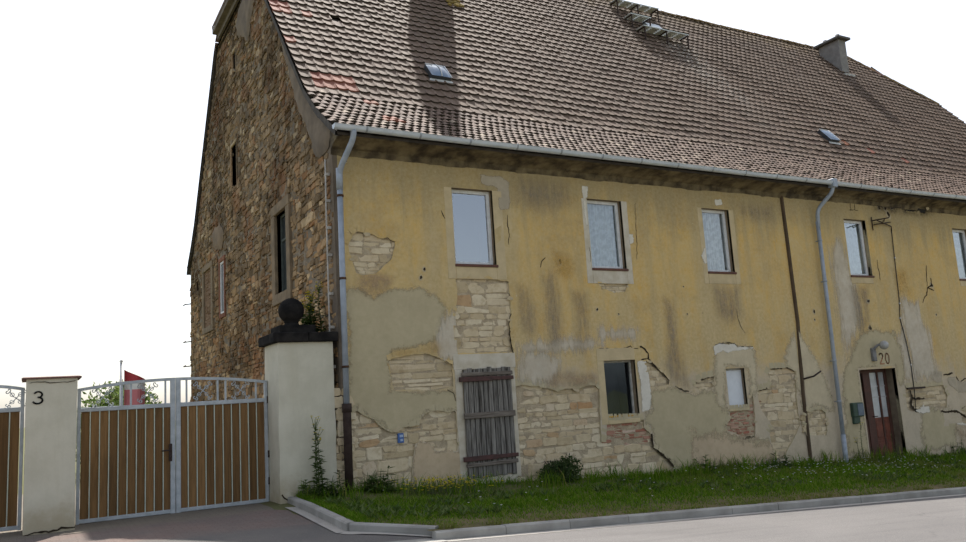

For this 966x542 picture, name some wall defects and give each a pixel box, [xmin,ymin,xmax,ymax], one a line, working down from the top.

flaking render [344,224,397,275]
flaking render [336,404,459,490]
flaking render [386,274,679,481]
flaking render [714,343,753,355]
flaking render [724,362,830,458]
flaking render [897,297,950,413]
crack [910,390,966,418]